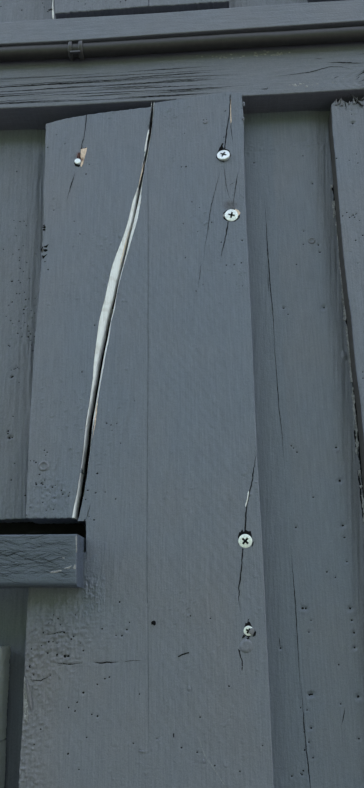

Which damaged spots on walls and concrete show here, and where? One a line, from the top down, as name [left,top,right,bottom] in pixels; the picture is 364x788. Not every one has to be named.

crack [0,66,238,520]
crack [265,210,285,468]
crack [0,531,73,583]
crack [238,457,256,612]